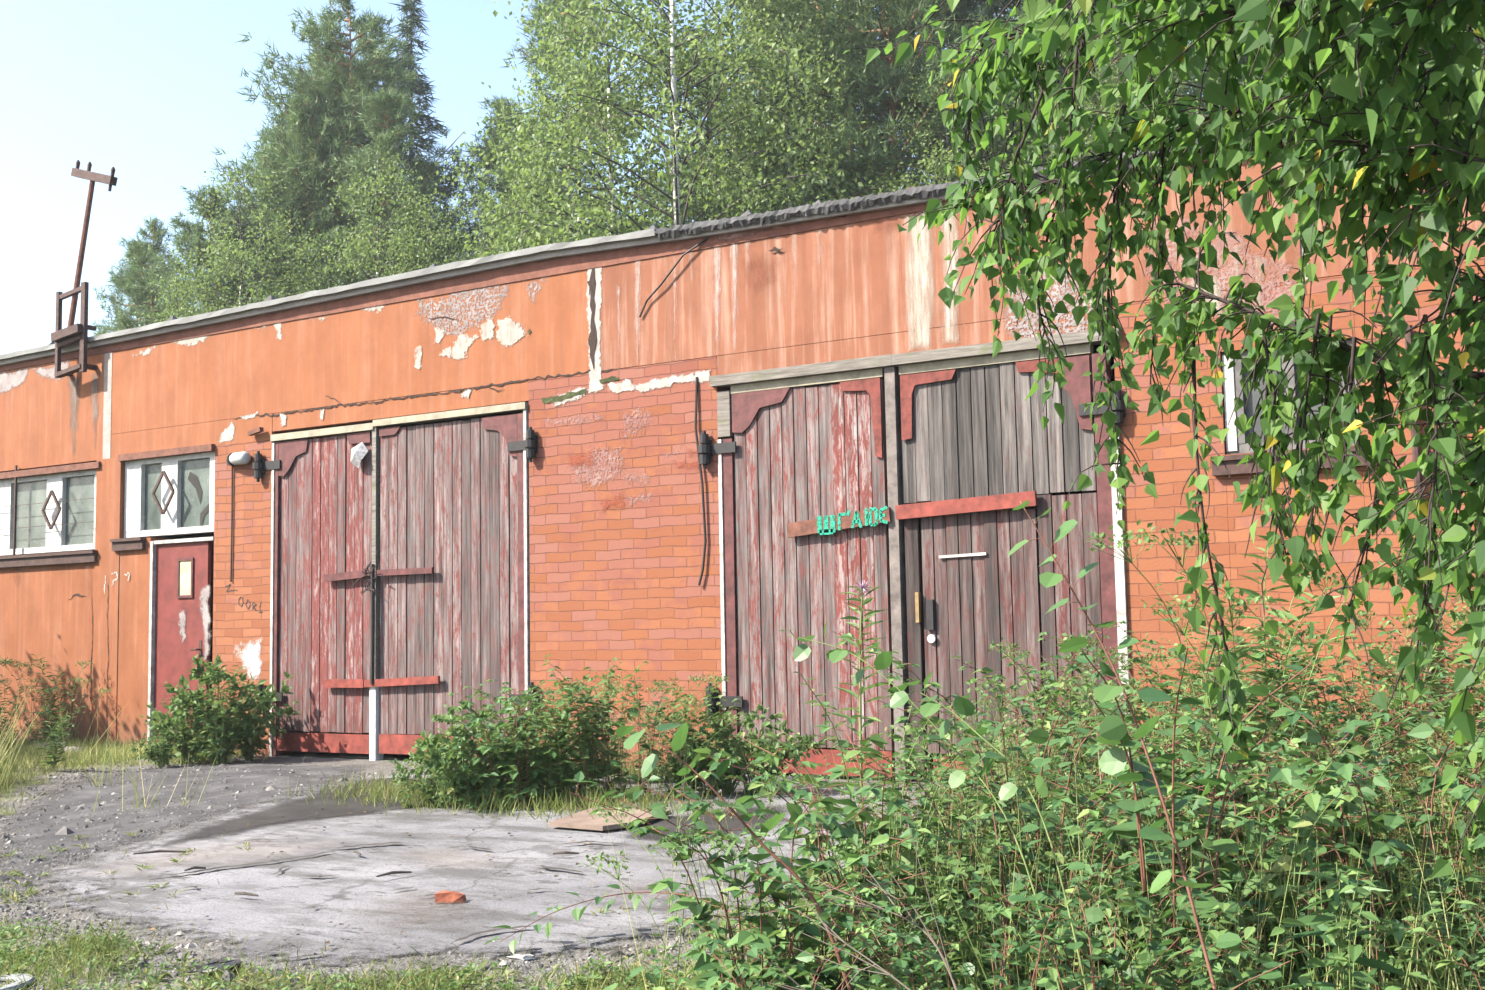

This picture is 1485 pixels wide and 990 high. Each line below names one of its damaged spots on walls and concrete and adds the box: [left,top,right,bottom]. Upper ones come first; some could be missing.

peeling [0,360,69,393]
crack [233,268,618,420]
peeling [414,285,531,369]
peeling [542,267,711,505]
water stain [909,215,958,347]